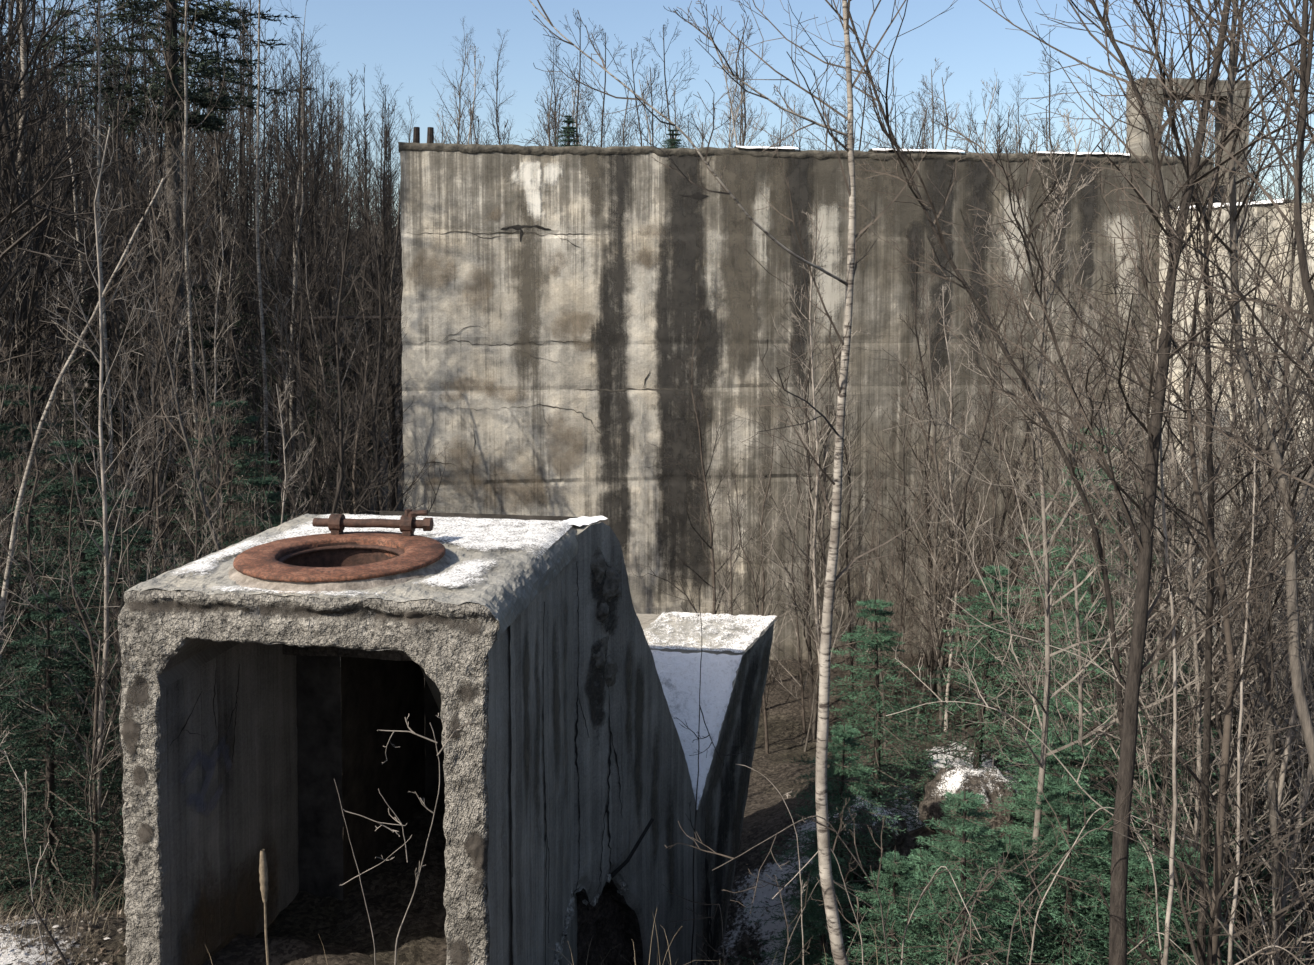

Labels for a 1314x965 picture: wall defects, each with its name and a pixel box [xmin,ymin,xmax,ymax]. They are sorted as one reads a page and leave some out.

crack [407,231,612,249]
water stain [515,192,545,379]
water stain [580,154,845,595]
water stain [855,157,1028,384]
water stain [586,563,618,736]
crack [507,645,515,965]
crack [543,563,622,965]
spalling [553,874,629,965]